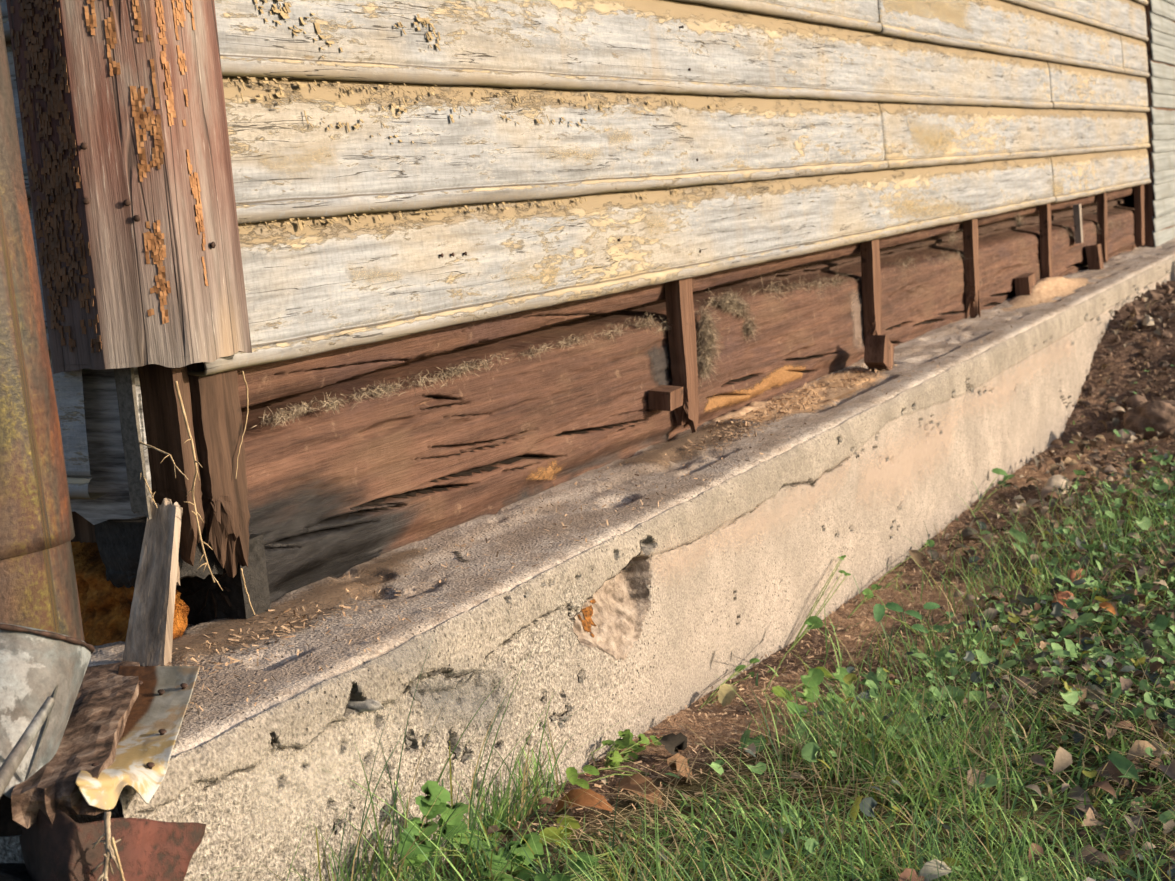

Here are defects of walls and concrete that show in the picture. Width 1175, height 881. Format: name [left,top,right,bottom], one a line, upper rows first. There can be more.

peeling [84,0,121,76]
peeling [130,0,196,182]
peeling [228,77,477,144]
peeling [11,0,102,353]
peeling [143,220,171,324]
crack [885,292,1010,344]
crack [707,374,758,398]
crack [333,396,638,520]
crack [781,457,851,488]
spalling [573,535,657,660]
crack [427,604,575,680]
crack [203,720,338,790]